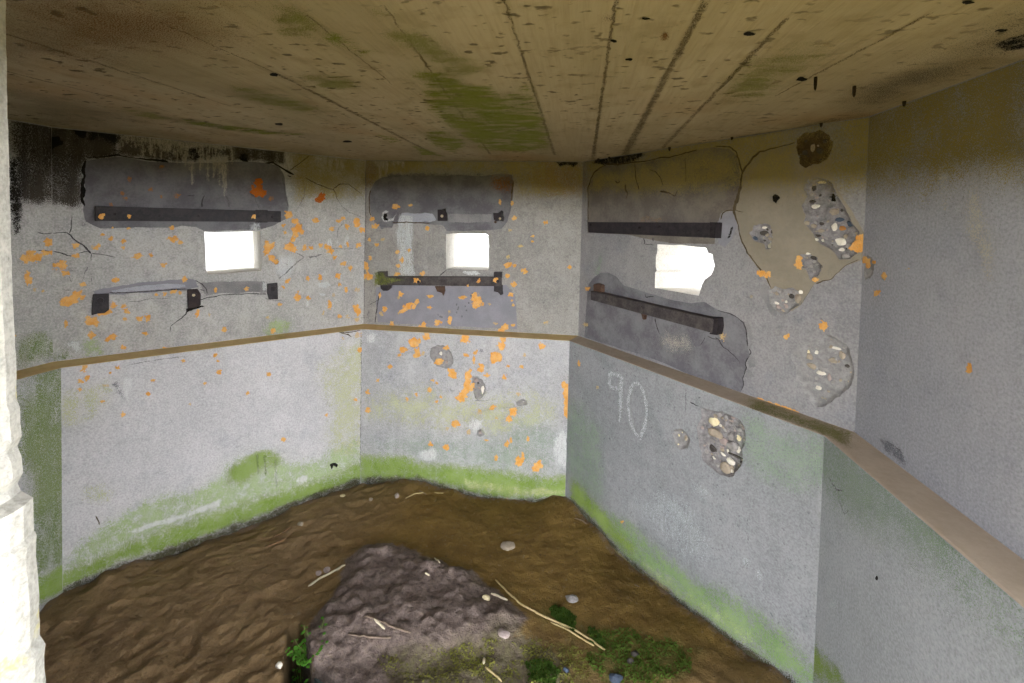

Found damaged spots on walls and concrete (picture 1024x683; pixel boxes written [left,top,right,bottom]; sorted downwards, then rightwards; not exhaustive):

leakage [7,7,1024,282]
spalling [750,223,773,249]
spalling [796,130,875,280]
crack [38,150,429,463]
spalling [768,286,803,314]
spalling [430,345,454,369]
spalling [472,376,486,400]
spalling [791,334,854,407]
spalling [671,406,746,477]
leakage [63,474,545,592]
leakage [570,497,801,683]